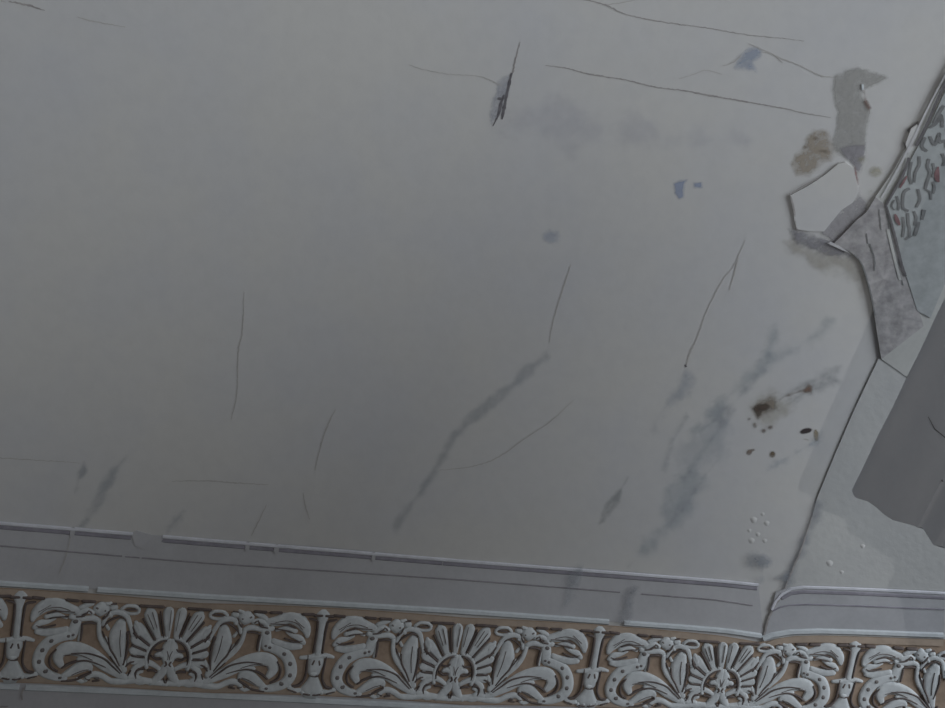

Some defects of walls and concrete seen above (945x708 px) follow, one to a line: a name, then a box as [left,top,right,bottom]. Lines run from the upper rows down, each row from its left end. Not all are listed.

crack [410,43,520,126]
crack [546,0,834,118]
flaking render [789,69,885,255]
peeling [904,122,920,154]
crack [684,241,745,367]
leakage [754,400,775,432]